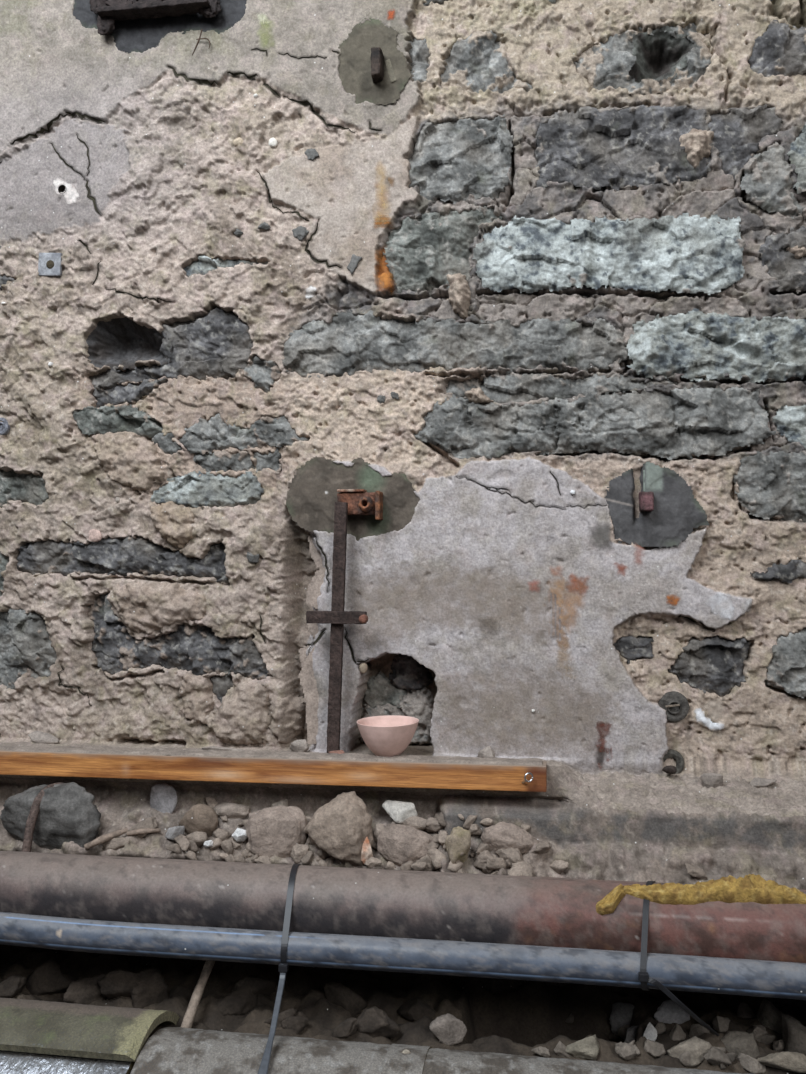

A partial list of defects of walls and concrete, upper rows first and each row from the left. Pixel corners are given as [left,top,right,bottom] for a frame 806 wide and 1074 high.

spalling [73,0,247,53]
crack [168,48,381,133]
crack [0,112,106,216]
spalling [383,20,806,297]
crack [257,171,341,268]
crack [77,240,175,303]
corrosion [377,249,394,289]
spalling [72,307,806,548]
spalling [88,593,272,703]
corrosion [551,576,587,645]
spalling [361,654,434,745]
corrosion [597,722,609,765]